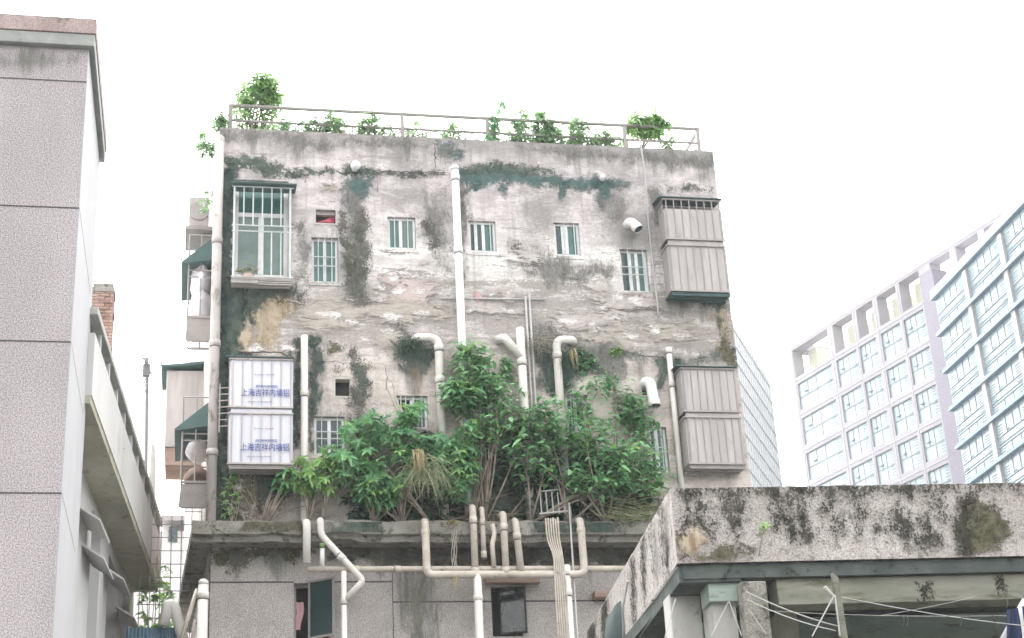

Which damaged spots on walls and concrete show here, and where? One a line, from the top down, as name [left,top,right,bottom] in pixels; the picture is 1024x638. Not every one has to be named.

leakage [220,222,312,356]
spalling [239,343,299,356]
leakage [335,186,374,308]
leakage [416,141,569,279]
leakage [541,145,714,225]
leakage [211,438,1024,638]